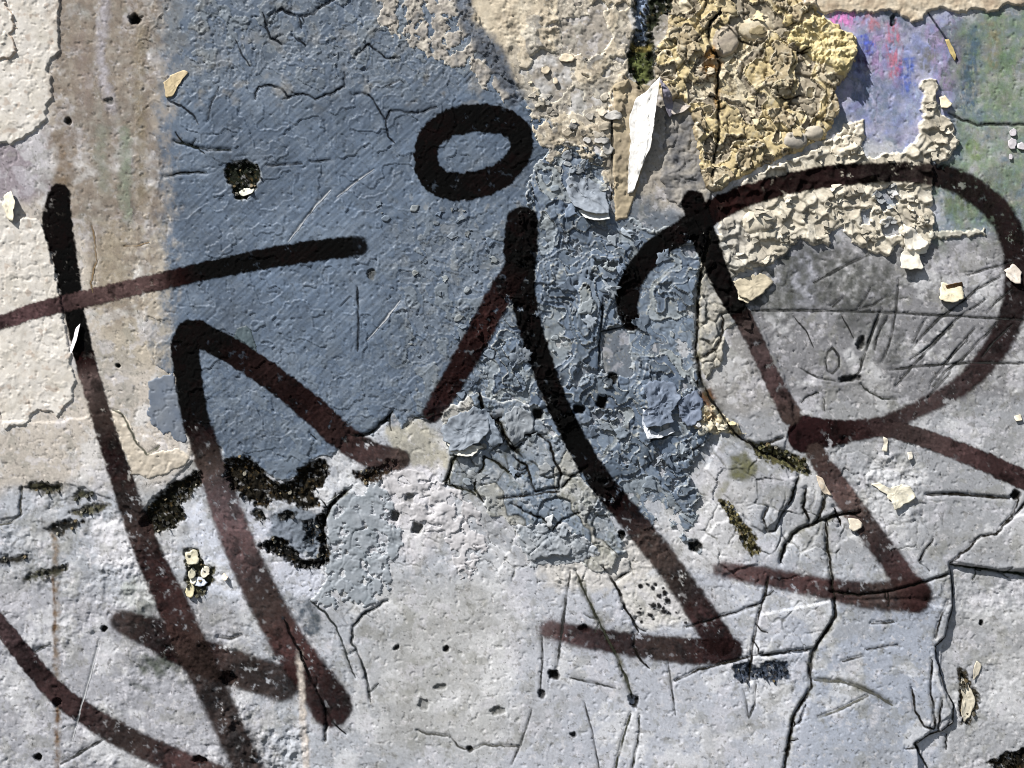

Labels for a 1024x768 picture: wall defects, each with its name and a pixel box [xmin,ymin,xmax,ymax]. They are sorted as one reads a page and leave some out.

crack [262,0,333,45]
crack [164,86,231,177]
crack [267,158,330,166]
crack [235,39,437,143]
peeling [352,0,1024,581]
crack [444,392,588,531]
crack [647,436,705,468]
crack [674,230,1024,768]
crack [575,567,649,768]